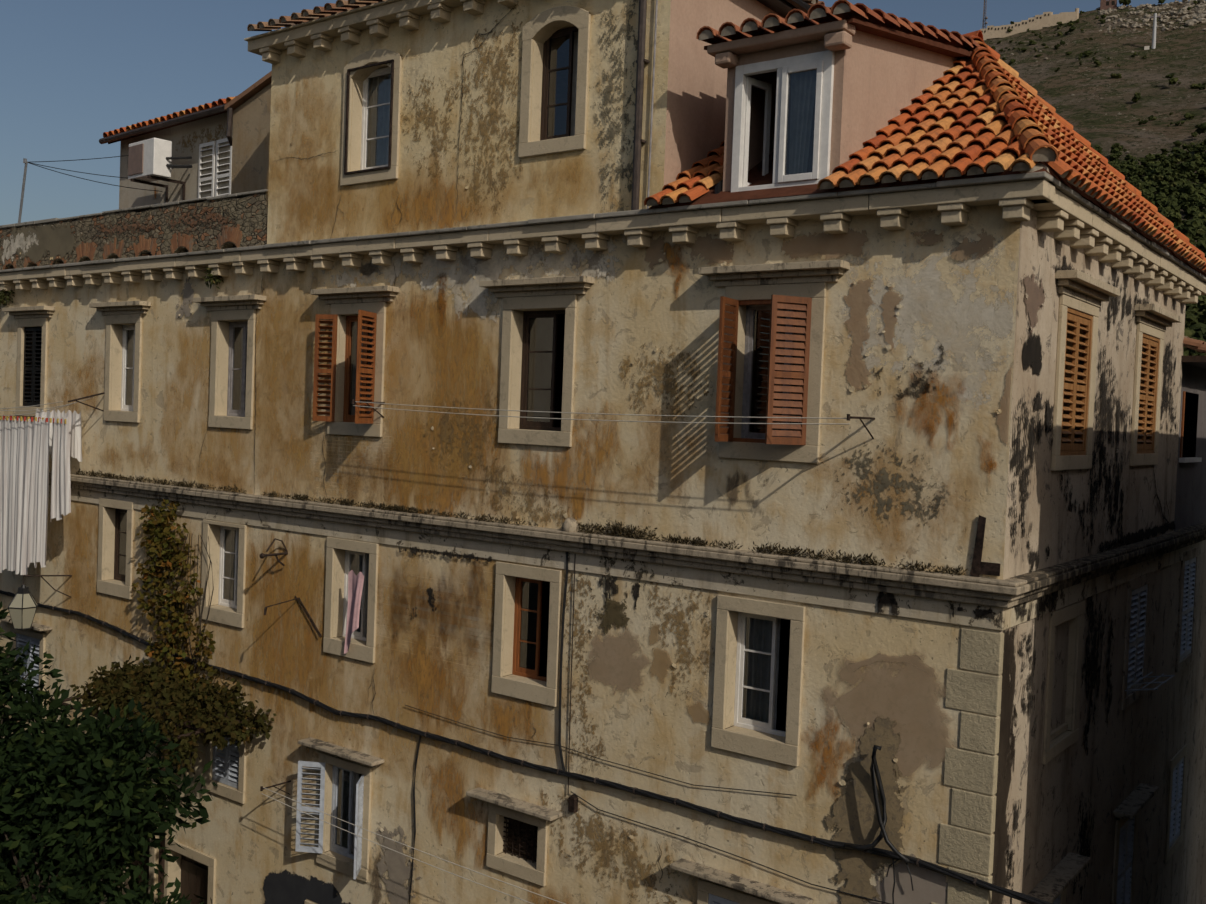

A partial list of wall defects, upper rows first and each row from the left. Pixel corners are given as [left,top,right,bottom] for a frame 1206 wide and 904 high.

peeling [620,343,713,418]
peeling [781,226,868,260]
peeling [844,279,903,392]
mould [1009,332,1054,572]
peeling [1022,274,1046,338]
damp [1056,255,1091,285]
mould [1057,277,1150,555]
mould [1161,336,1178,441]
peeling [564,570,609,774]
peeling [645,582,715,698]
mould [1080,593,1116,755]
flaking render [824,716,909,904]